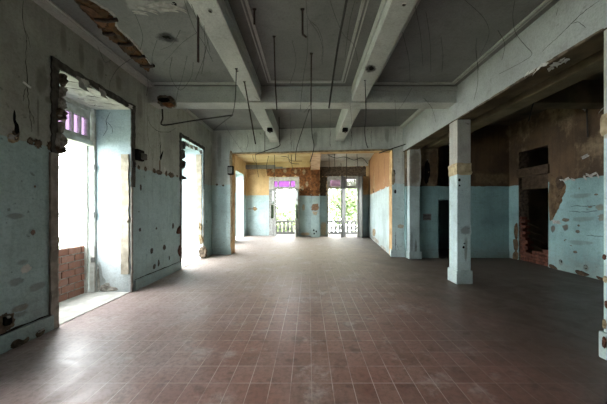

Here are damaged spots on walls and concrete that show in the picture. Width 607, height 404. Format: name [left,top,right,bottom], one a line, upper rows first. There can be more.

spalling [74,0,155,72]
spalling [455,28,604,121]
flaking render [7,110,20,143]
flaking render [27,73,113,154]
spalling [157,95,177,109]
flaking render [229,149,396,200]
flaking render [313,220,327,236]
flaking render [548,174,581,254]
peeling [588,203,604,222]
flaking render [0,306,29,334]
flaking render [10,328,45,349]